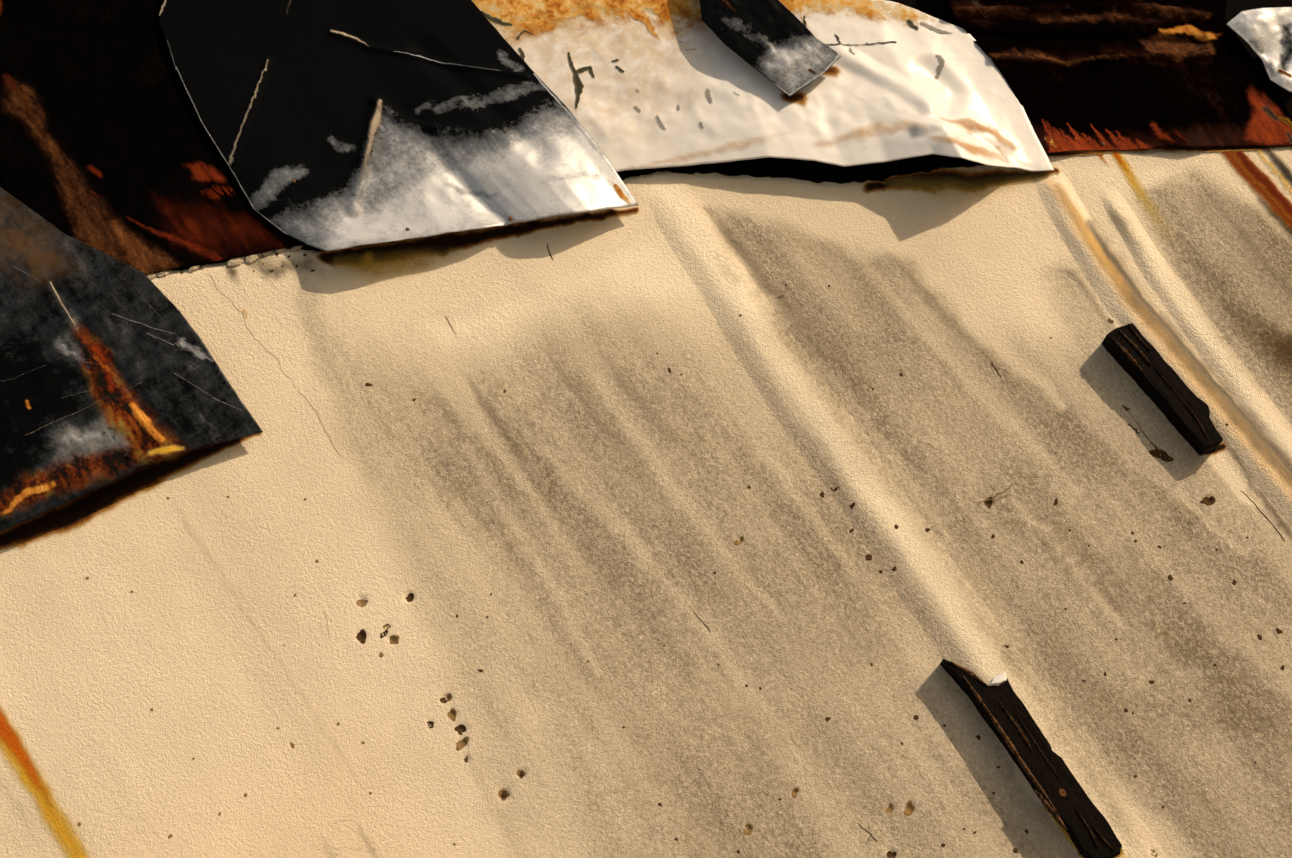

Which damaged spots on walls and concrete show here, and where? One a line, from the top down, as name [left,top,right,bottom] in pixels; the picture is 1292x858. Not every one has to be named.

peeling [481,11,533,60]
corrosion [472,0,703,38]
peeling [826,34,896,54]
peeling [907,19,953,34]
peeling [567,52,595,108]
peeling [935,55,945,79]
spalling [146,265,200,280]
spalling [226,245,315,272]
corrosion [863,88,1292,484]
corrosion [0,327,262,550]
corrosion [0,709,88,858]